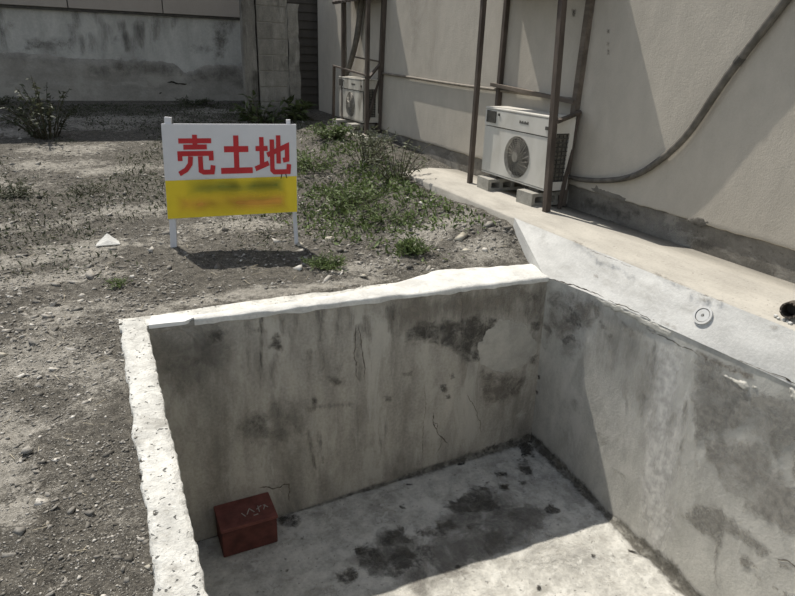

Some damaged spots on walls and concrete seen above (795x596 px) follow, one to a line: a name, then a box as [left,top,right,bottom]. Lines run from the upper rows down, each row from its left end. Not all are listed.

crack [354,327,366,378]
spalling [118,217,795,596]
damp [402,295,512,360]
damp [337,354,701,596]
damp [686,506,767,555]
damp [685,359,795,534]